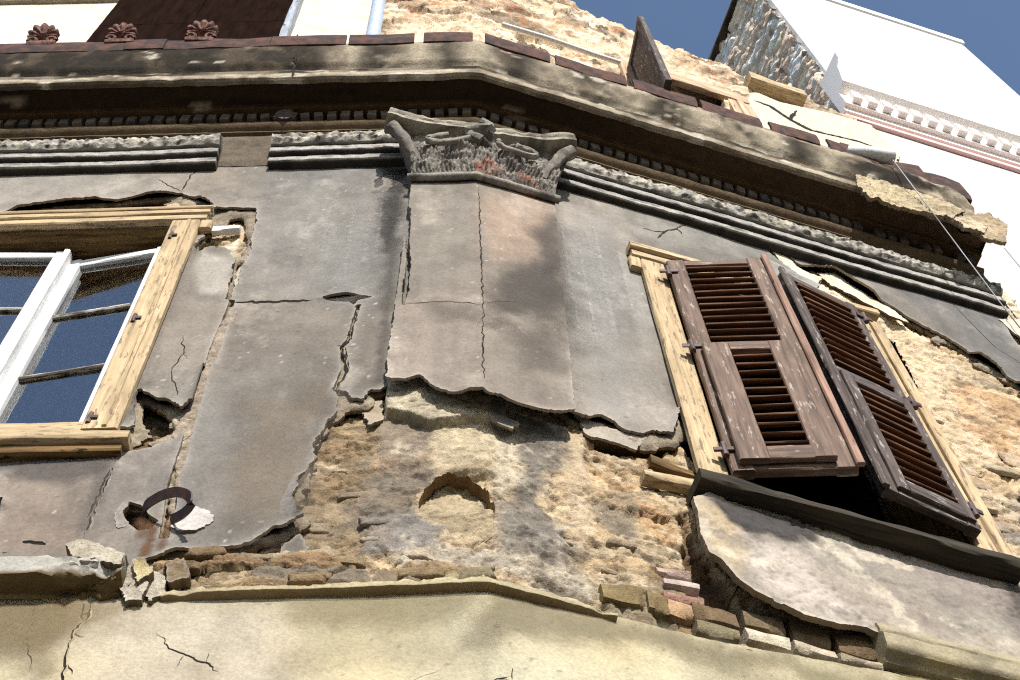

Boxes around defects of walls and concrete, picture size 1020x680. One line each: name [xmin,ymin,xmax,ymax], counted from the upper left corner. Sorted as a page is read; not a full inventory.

spalling [854,175,1008,246]
crack [418,188,495,378]
crack [171,339,189,395]
crack [231,296,371,392]
flaking render [769,252,1020,558]
flaking render [65,377,914,678]
crack [23,603,37,667]
crack [61,602,93,680]
crack [157,634,216,671]